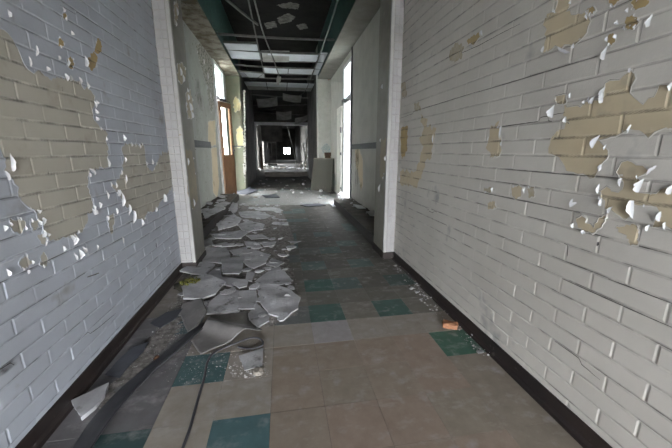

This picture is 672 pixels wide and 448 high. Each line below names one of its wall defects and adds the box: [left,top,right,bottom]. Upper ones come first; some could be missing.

spalling [264,2,308,30]
peeling [541,0,597,54]
peeling [600,0,653,60]
peeling [177,62,194,119]
peeling [0,27,175,274]
peeling [399,102,437,189]
peeling [546,68,672,246]